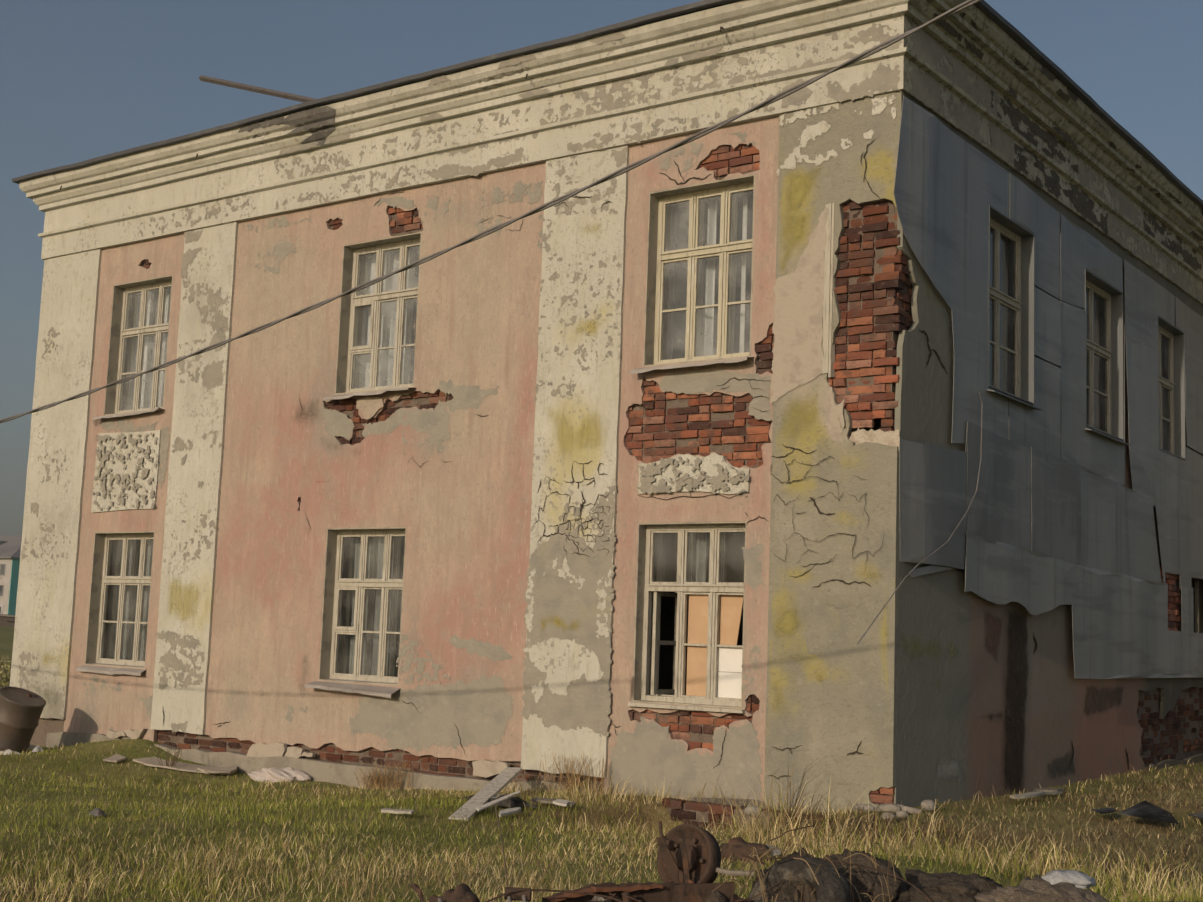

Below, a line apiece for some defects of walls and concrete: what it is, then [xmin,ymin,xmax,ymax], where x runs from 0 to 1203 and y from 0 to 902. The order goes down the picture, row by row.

peeling [135,23,1203,403]
flaking render [829,200,913,451]
peeling [321,379,499,446]
flaking render [626,325,774,495]
peeling [91,417,222,511]
peeling [171,510,217,560]
crack [531,461,610,556]
crack [638,444,884,588]
peeling [139,630,204,720]
peeling [349,485,765,800]
crack [768,745,803,779]
flaking render [1137,687,1203,767]